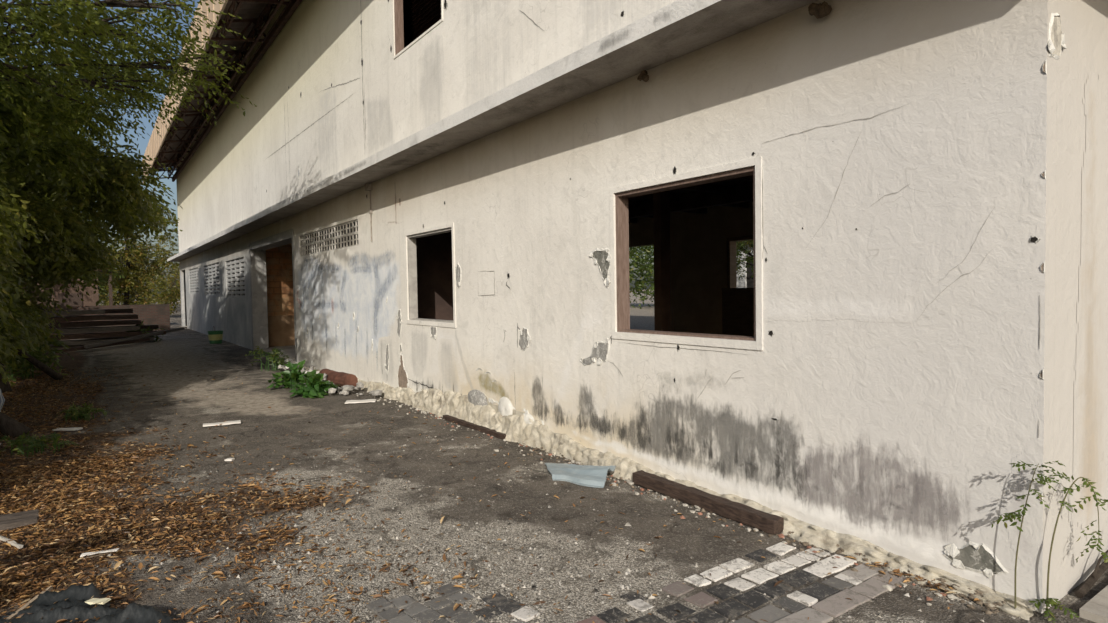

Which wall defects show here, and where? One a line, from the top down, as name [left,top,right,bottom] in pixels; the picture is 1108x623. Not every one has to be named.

crack [757,103,910,258]
spalling [589,248,611,288]
crack [921,213,993,315]
spalling [580,338,610,366]
leakage [533,290,986,580]
spalling [942,541,1008,578]